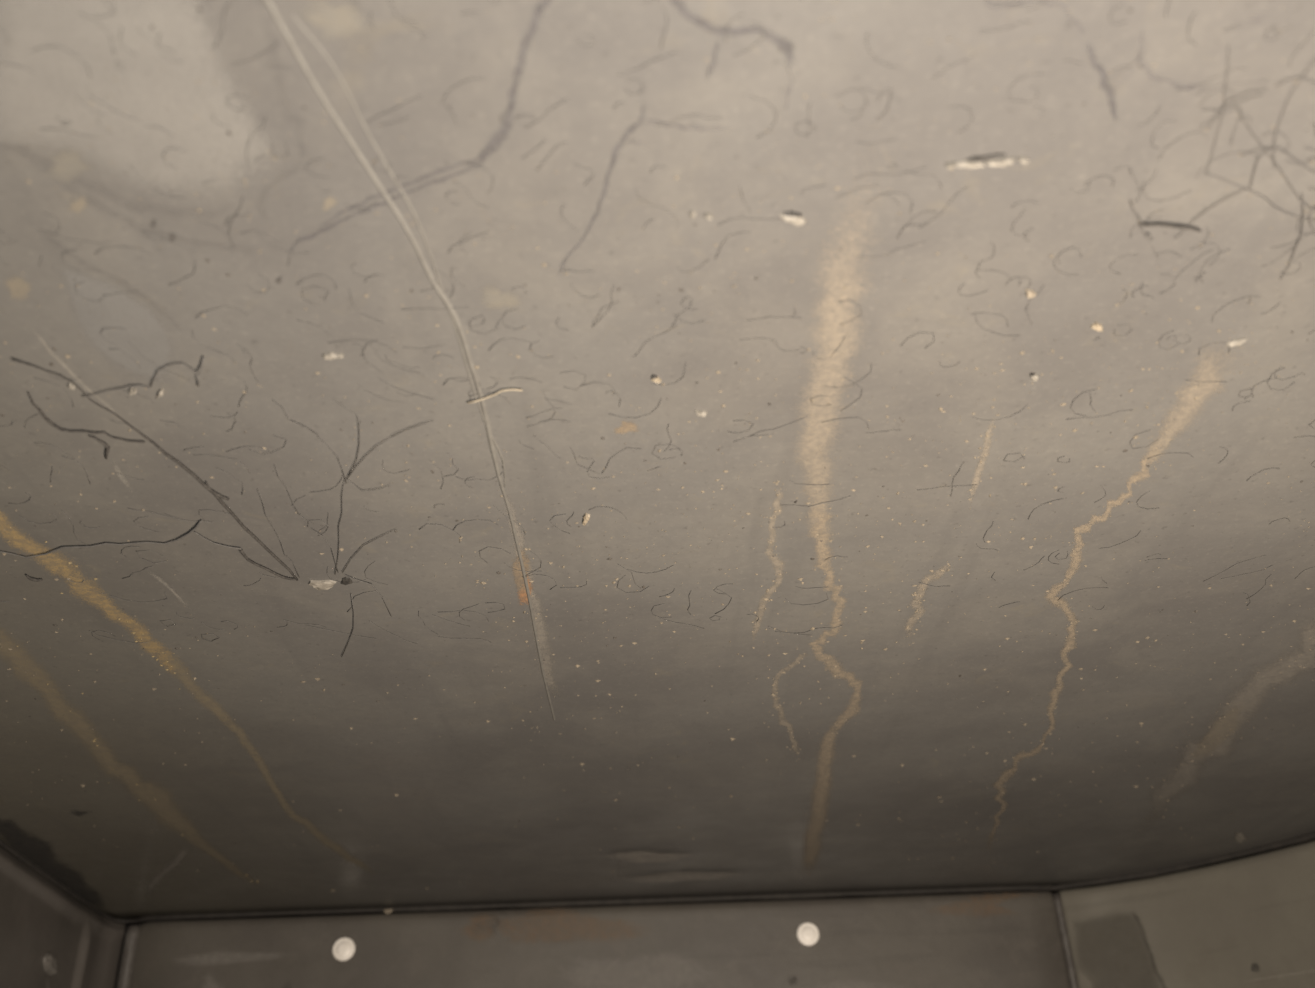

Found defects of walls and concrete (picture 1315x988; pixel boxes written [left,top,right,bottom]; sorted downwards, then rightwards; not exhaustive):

crack [289,0,551,254]
crack [558,102,723,275]
crack [669,0,795,109]
water stain [752,481,786,649]
water stain [771,143,892,878]
water stain [985,320,1257,870]